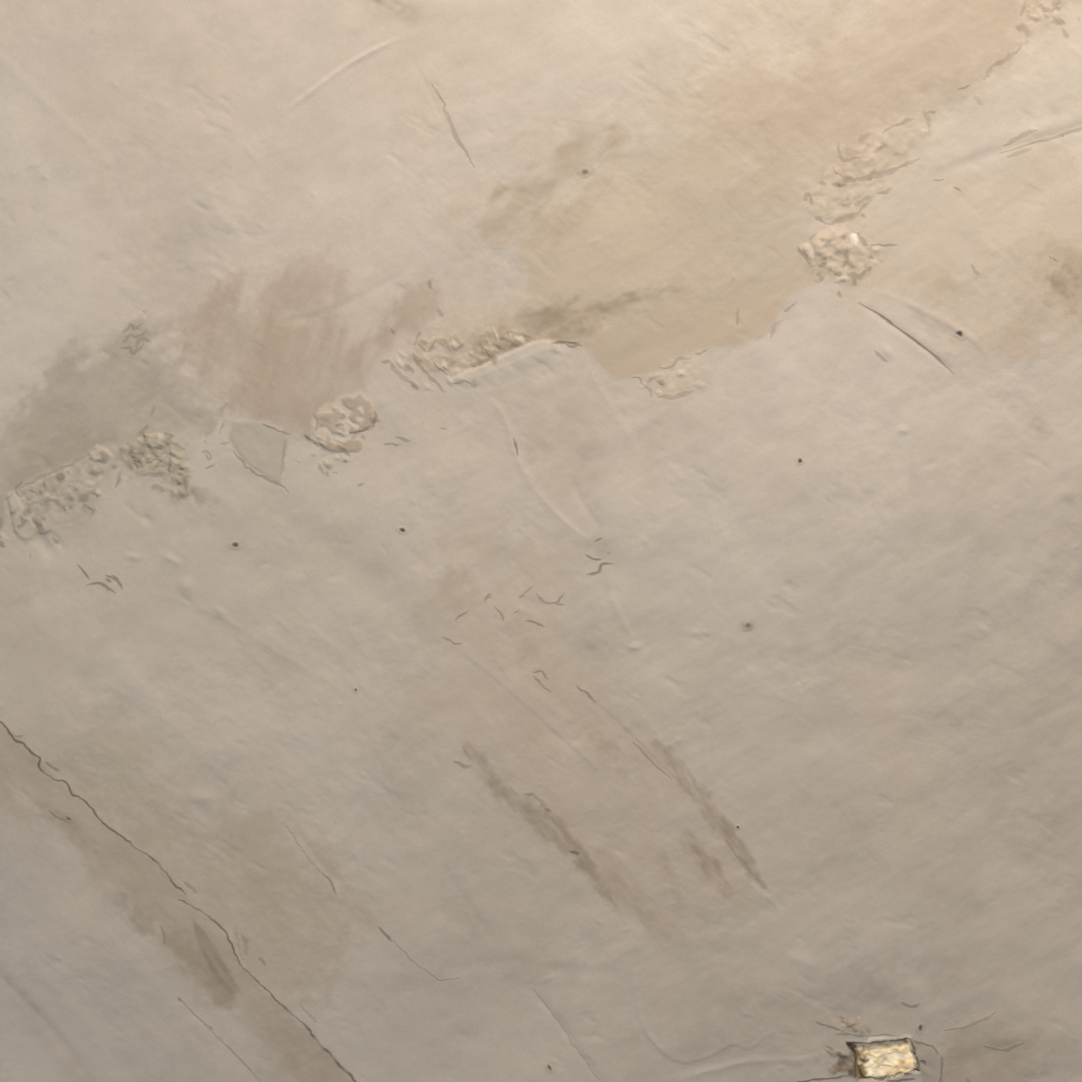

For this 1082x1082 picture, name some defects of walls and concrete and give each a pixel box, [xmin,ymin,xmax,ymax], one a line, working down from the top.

damp [0,0,1082,533]
spalling [381,308,610,396]
spalling [0,389,411,558]
damp [377,496,770,964]
crack [0,720,358,1082]
crack [378,926,459,981]
crack [533,988,603,1082]
crack [795,1073,847,1082]